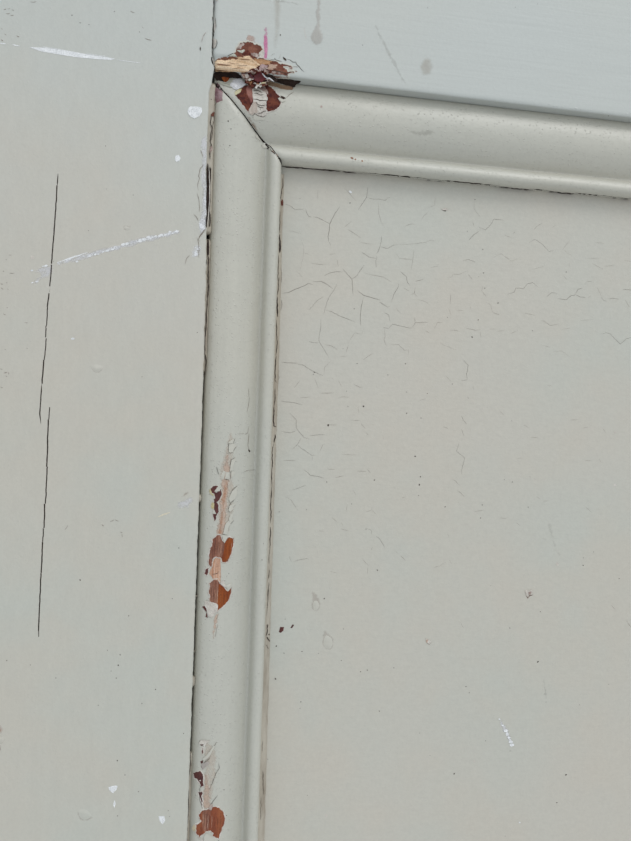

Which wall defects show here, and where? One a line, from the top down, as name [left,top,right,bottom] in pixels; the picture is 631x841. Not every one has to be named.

crack [211,0,233,74]
peeling [213,50,301,121]
crack [185,112,215,375]
crack [38,176,58,637]
crack [227,95,630,648]
peeling [203,438,238,637]
peeling [191,740,226,841]